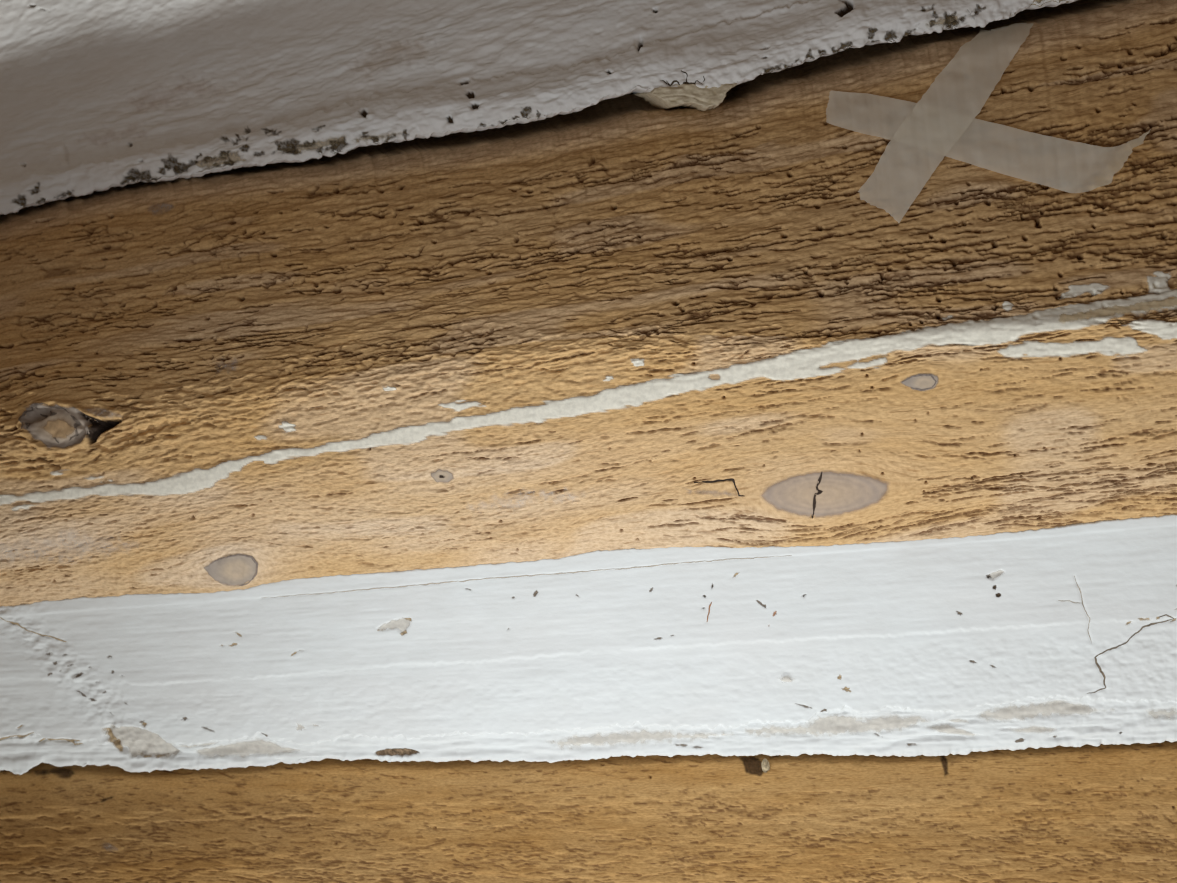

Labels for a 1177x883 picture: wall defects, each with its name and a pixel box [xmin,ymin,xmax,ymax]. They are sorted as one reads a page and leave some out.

flaking render [635,83,737,111]
peeling [1058,283,1109,300]
peeling [1147,271,1172,294]
peeling [998,319,1177,357]
peeling [439,400,485,411]
peeling [279,421,296,432]
crack [1058,576,1174,694]